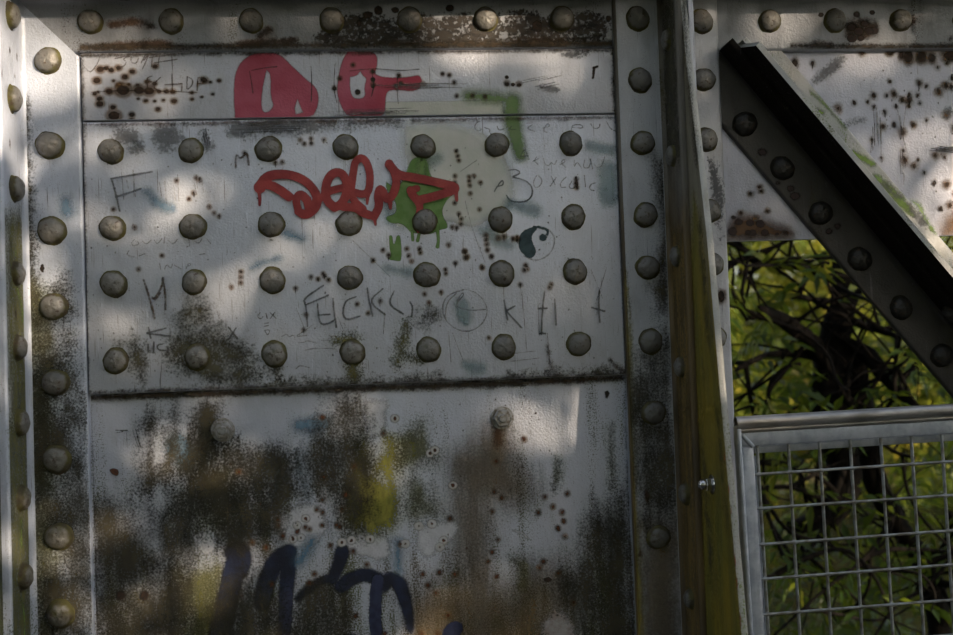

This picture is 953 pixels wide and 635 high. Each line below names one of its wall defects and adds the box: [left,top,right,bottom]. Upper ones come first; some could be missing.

rust [852,62,953,192]
rust [450,149,482,195]
rust [728,208,794,240]
rust [939,202,953,235]
rust [444,233,519,275]
water stain [26,101,444,635]
water stain [412,333,681,635]
rust [276,492,374,553]
rust [536,495,567,539]